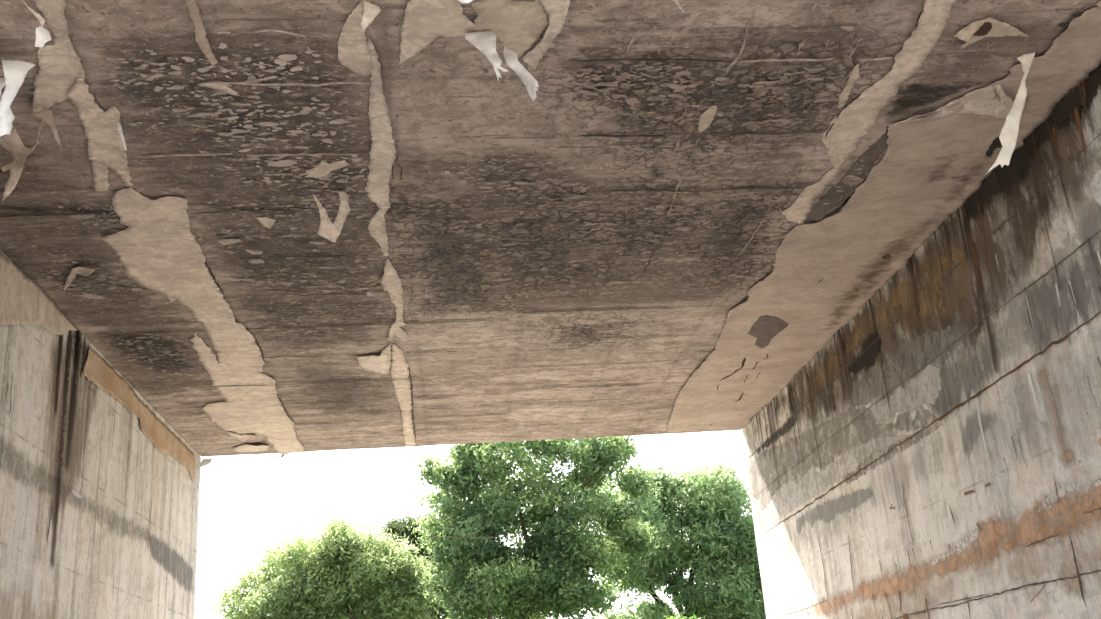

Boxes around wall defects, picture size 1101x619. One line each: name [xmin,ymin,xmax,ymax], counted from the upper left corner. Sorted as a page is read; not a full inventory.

peeling [0,0,416,481]
peeling [445,0,1101,433]
water stain [747,61,1101,534]
water stain [0,440,193,589]
peeling [766,435,906,522]
rust [811,480,1101,619]
crack [1026,533,1087,608]